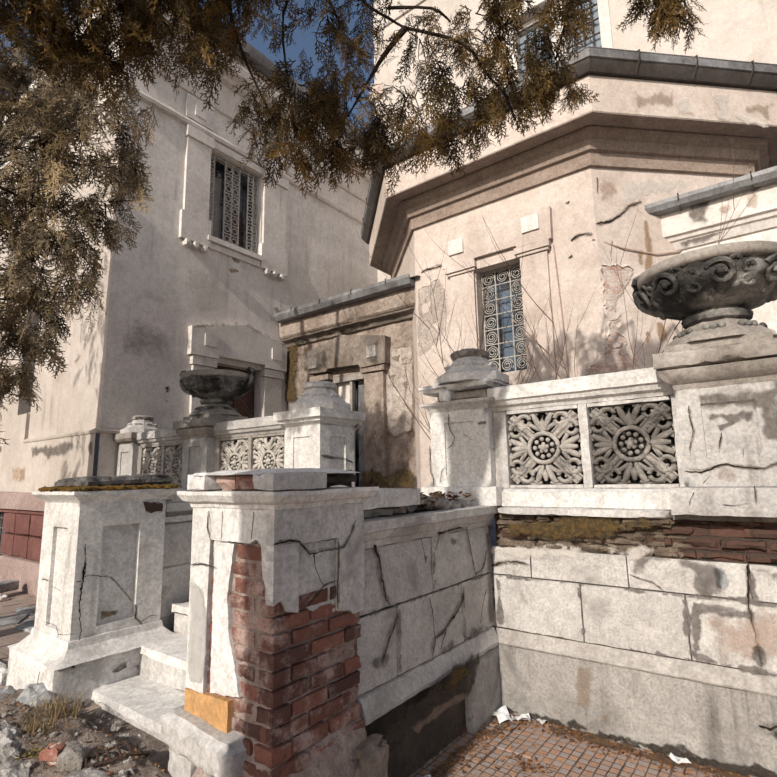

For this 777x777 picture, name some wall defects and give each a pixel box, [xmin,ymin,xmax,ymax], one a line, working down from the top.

crack [571,201,641,241]
peeling [386,277,449,438]
spalling [583,263,636,376]
crack [686,405,777,506]
crack [44,544,156,640]
crack [374,545,398,663]
crack [421,526,525,574]
crack [746,565,763,667]
damp [383,654,480,751]
damp [529,713,586,730]
damp [598,730,777,777]
crack [759,723,777,731]